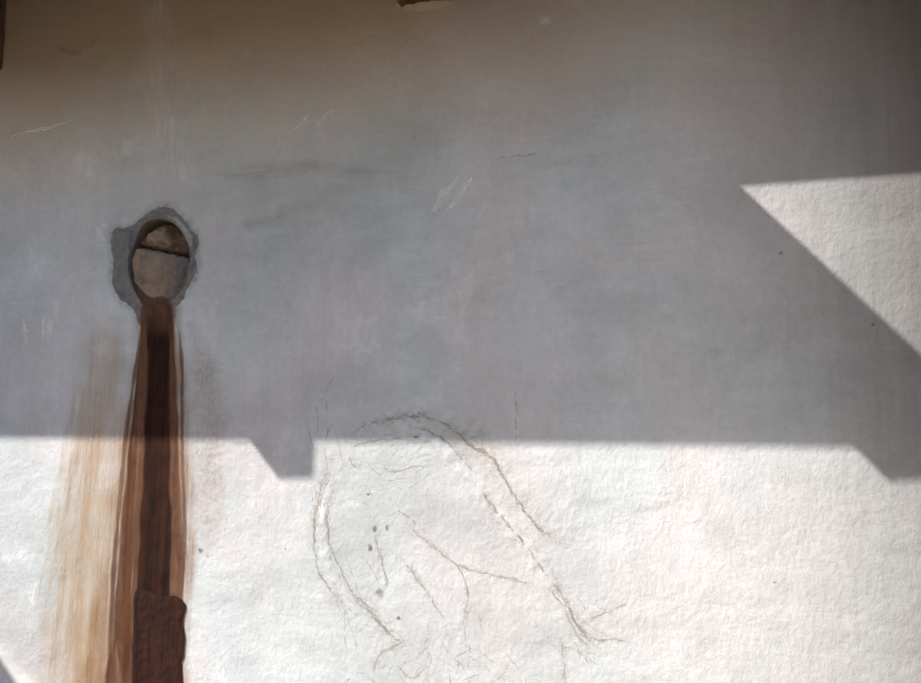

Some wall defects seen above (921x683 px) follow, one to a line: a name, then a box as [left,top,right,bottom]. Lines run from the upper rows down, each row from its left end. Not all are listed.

rust [80,283,194,683]
crack [312,464,403,668]
crack [349,412,628,679]